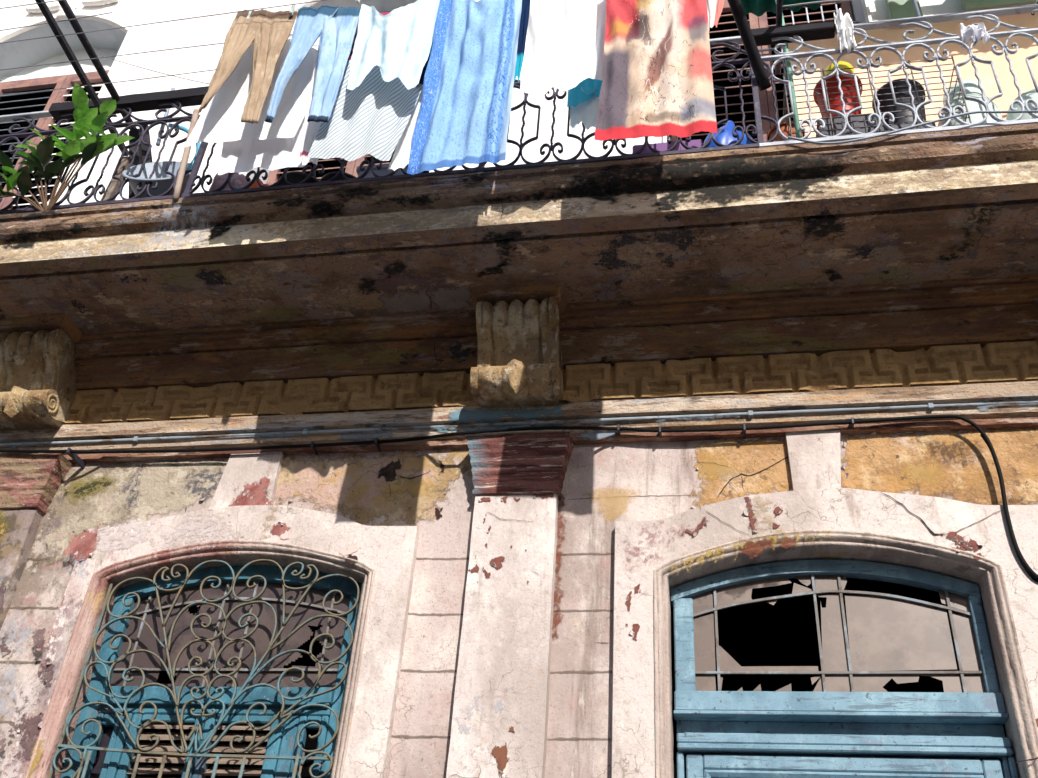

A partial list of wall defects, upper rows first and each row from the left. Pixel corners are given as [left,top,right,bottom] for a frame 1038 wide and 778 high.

damp [486,151,848,213]
damp [64,476,112,502]
spalling [40,404,568,565]
spalling [627,436,817,571]
crack [699,457,787,535]
spalling [841,427,1038,505]
crack [880,492,1002,535]
peeling [469,515,512,584]
peeling [625,584,641,611]
peeling [491,726,514,778]